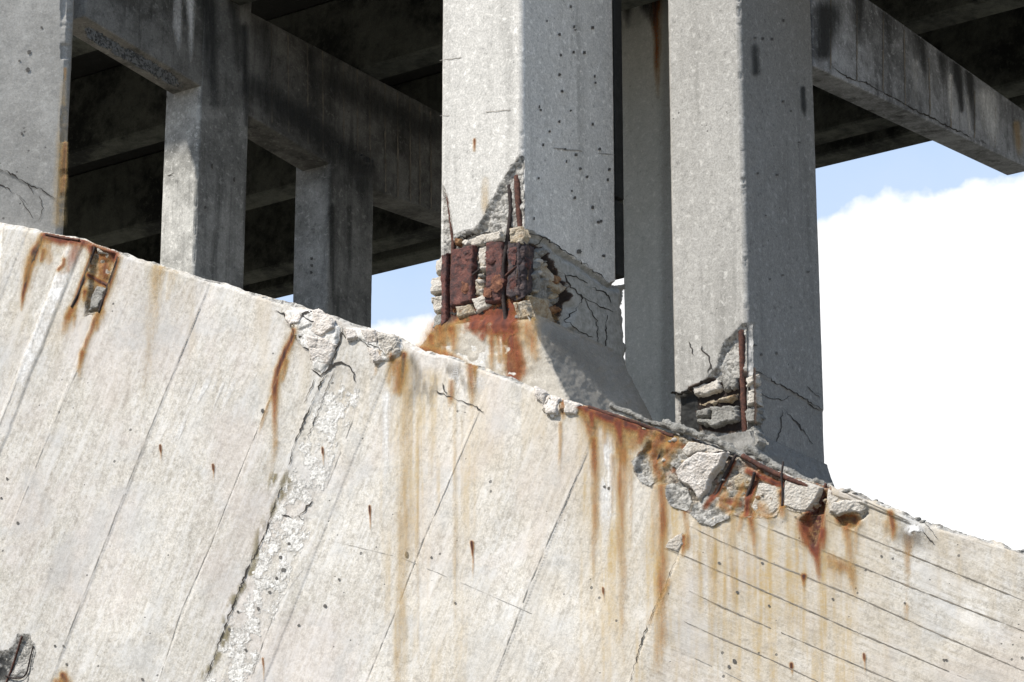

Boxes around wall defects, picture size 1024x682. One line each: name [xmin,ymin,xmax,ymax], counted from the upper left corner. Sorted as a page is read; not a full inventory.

crack [0,169,55,264]
spalling [446,157,566,322]
corrosion [21,233,119,367]
corrosion [272,328,296,425]
crack [437,383,483,412]
corrosion [418,296,535,388]
crack [529,233,613,346]
crack [755,370,820,444]
spalling [588,392,868,526]
peeling [207,384,360,682]
corrosion [799,494,860,567]
spalling [0,633,36,682]